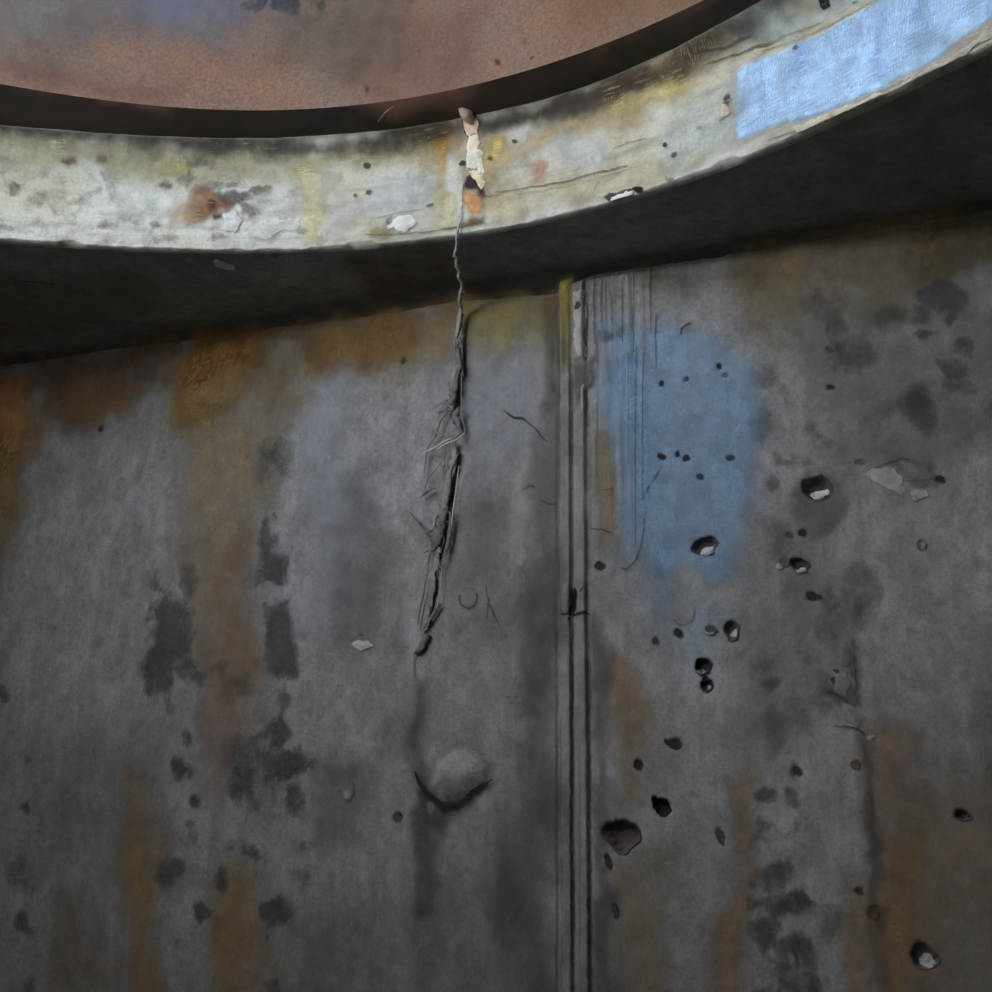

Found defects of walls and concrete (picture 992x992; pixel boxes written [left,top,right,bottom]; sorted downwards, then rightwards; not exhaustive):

rust [185,187,230,223]
spalling [368,208,475,235]
spalling [604,186,643,201]
spalling [801,475,833,501]
spalling [866,457,934,501]
damp [257,519,288,585]
spalling [691,536,719,556]
damp [142,592,196,695]
damp [263,599,297,678]
damp [233,717,313,813]
spalling [601,819,641,854]
damp [259,895,291,925]